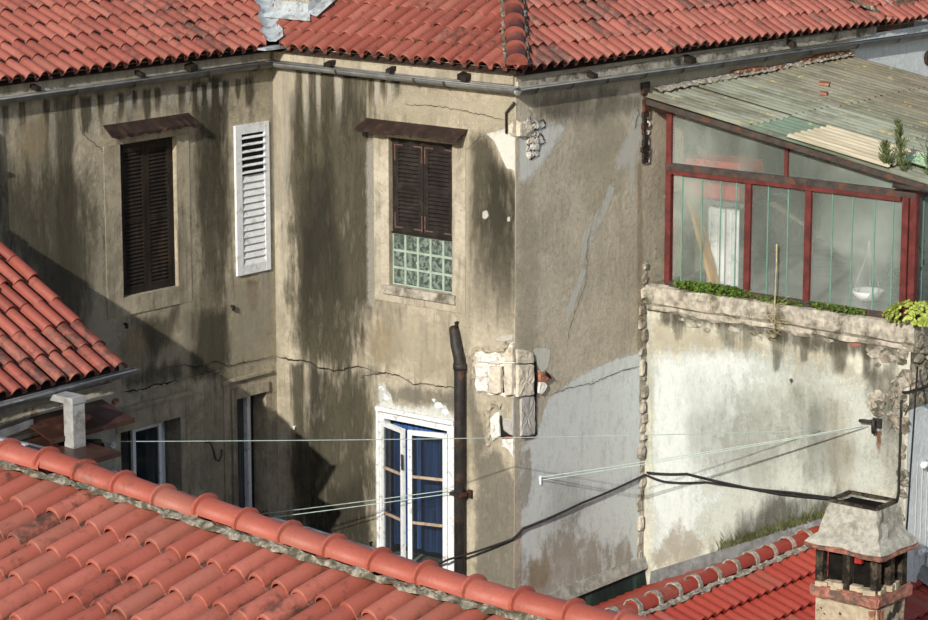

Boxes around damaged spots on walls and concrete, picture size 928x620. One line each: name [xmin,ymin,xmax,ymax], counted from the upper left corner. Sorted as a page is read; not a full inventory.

leakage [0,78,252,353]
peeling [487,119,564,182]
leakage [191,310,228,378]
crack [124,356,454,393]
leakage [284,70,515,546]
leakage [475,428,514,588]
flaking render [471,334,552,507]
peeling [521,262,649,595]
peeling [654,529,701,565]
leakage [730,496,829,547]
leakage [742,325,869,358]
spalling [849,333,928,499]